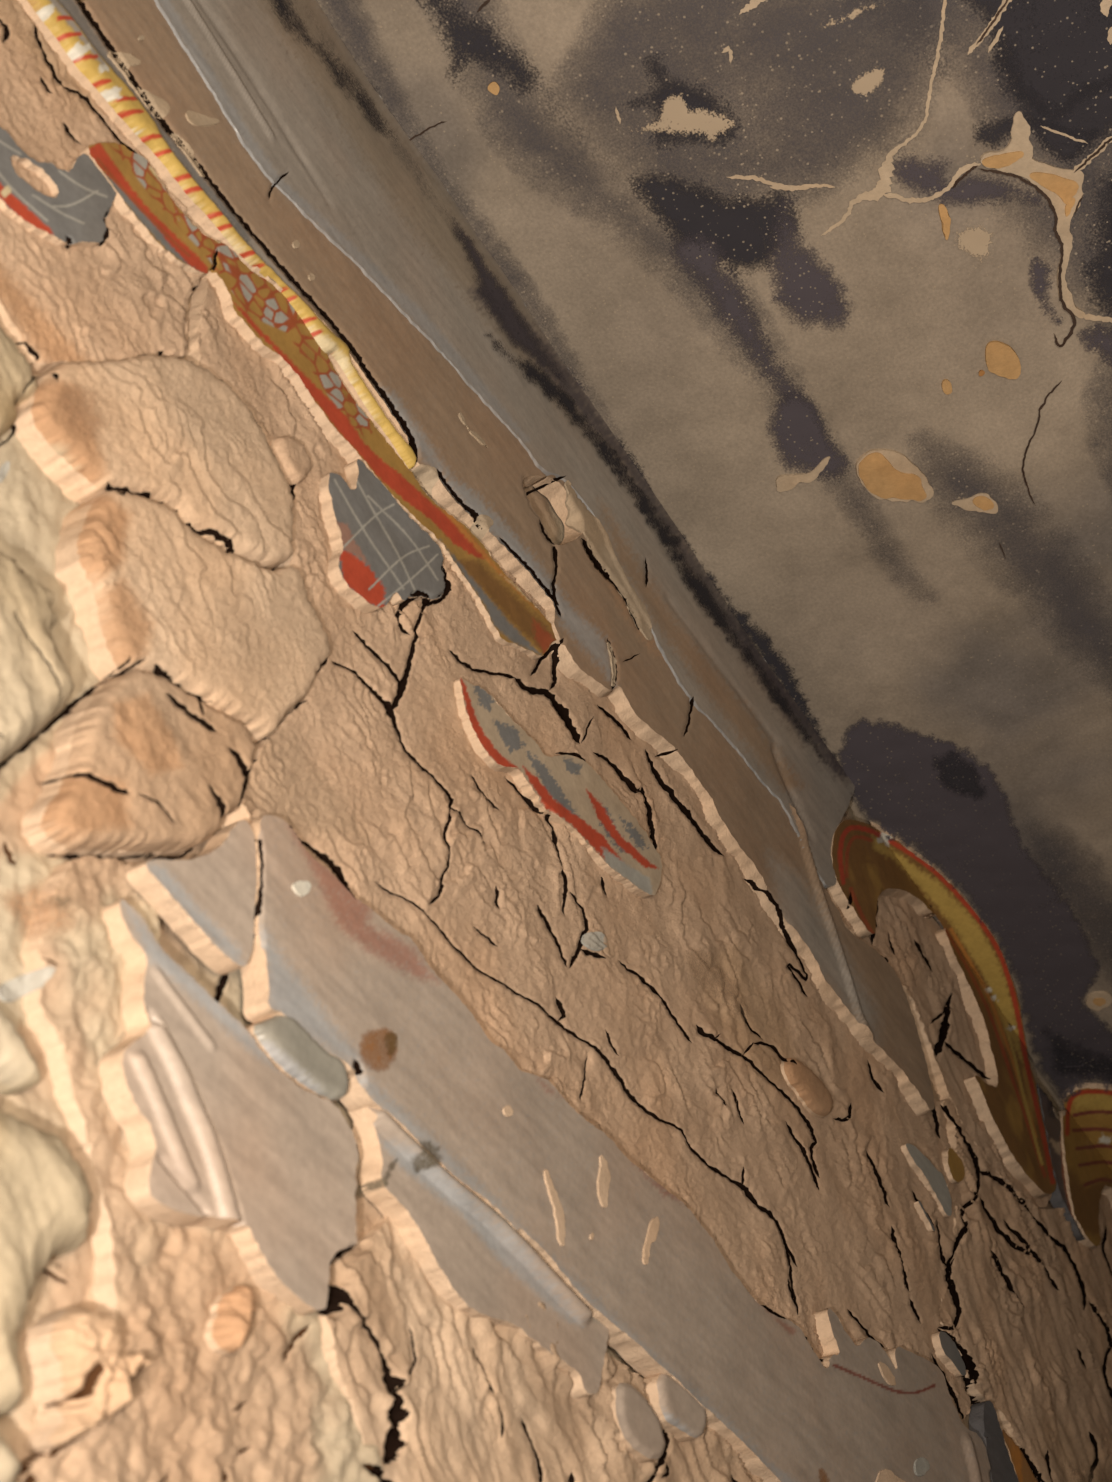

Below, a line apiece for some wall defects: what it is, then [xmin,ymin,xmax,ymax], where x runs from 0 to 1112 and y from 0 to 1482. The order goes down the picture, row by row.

spalling [0,0,378,478]
crack [728,0,1112,347]
spalling [938,203,951,240]
spalling [980,111,1085,319]
peeling [107,0,804,848]
spalling [185,278,1112,1482]
crack [847,892,990,1080]
crack [284,1244,417,1482]
spalling [0,856,781,1482]
crack [472,1346,575,1482]
crack [647,1429,670,1482]
crack [866,1105,1112,1482]